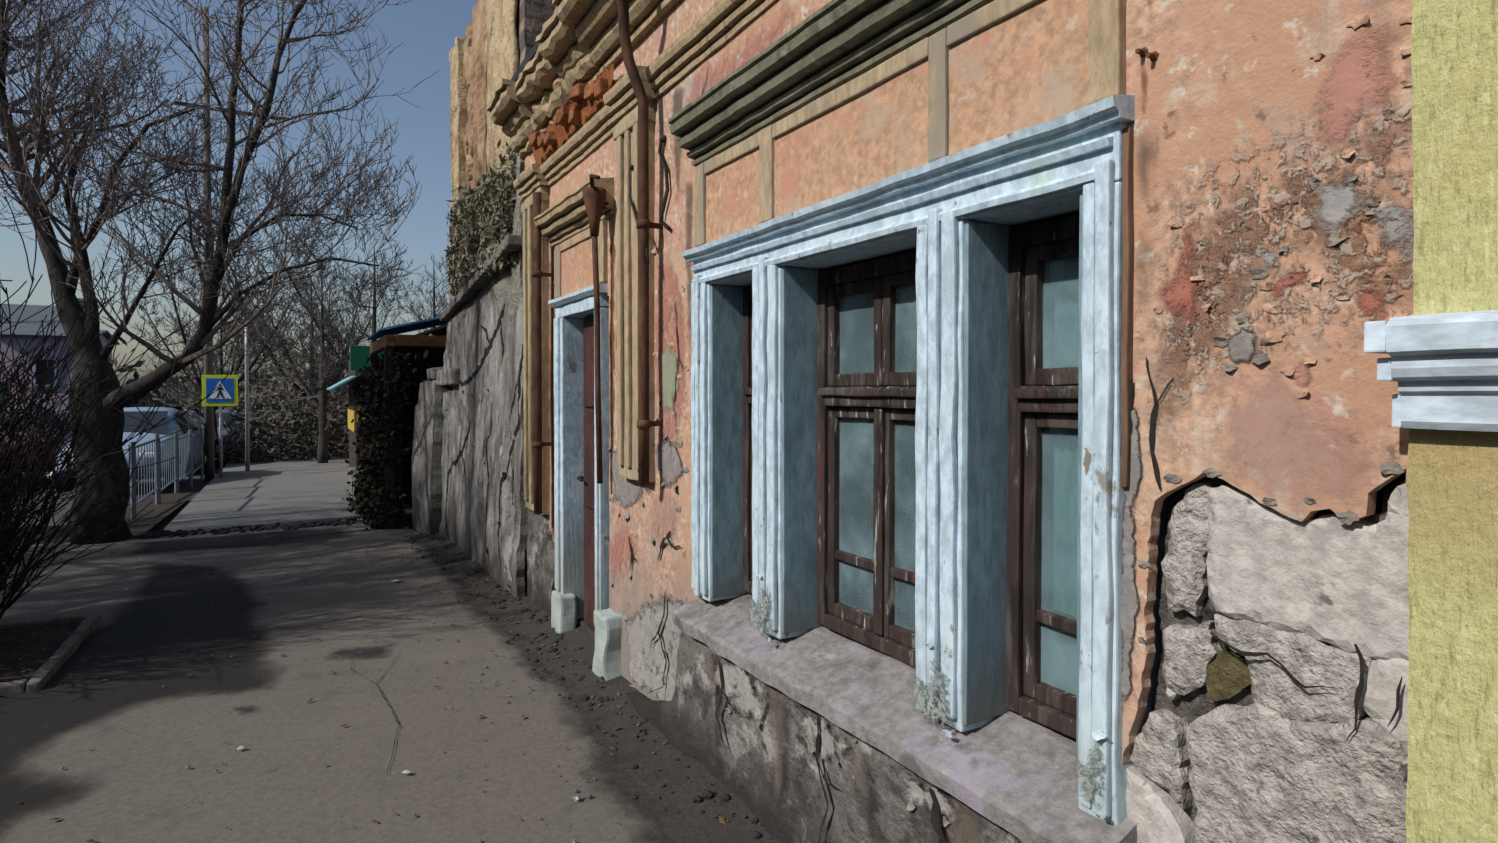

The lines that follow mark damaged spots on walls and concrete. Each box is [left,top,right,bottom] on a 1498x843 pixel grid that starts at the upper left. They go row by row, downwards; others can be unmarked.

spalling [528,62,615,163]
peeling [1153,10,1414,401]
crack [442,303,523,566]
corrosion [609,243,617,481]
crack [1130,357,1174,490]
spalling [622,593,687,701]
crack [715,659,741,754]
spalling [1126,462,1409,843]
crack [815,715,837,843]
peeling [1075,729,1107,819]